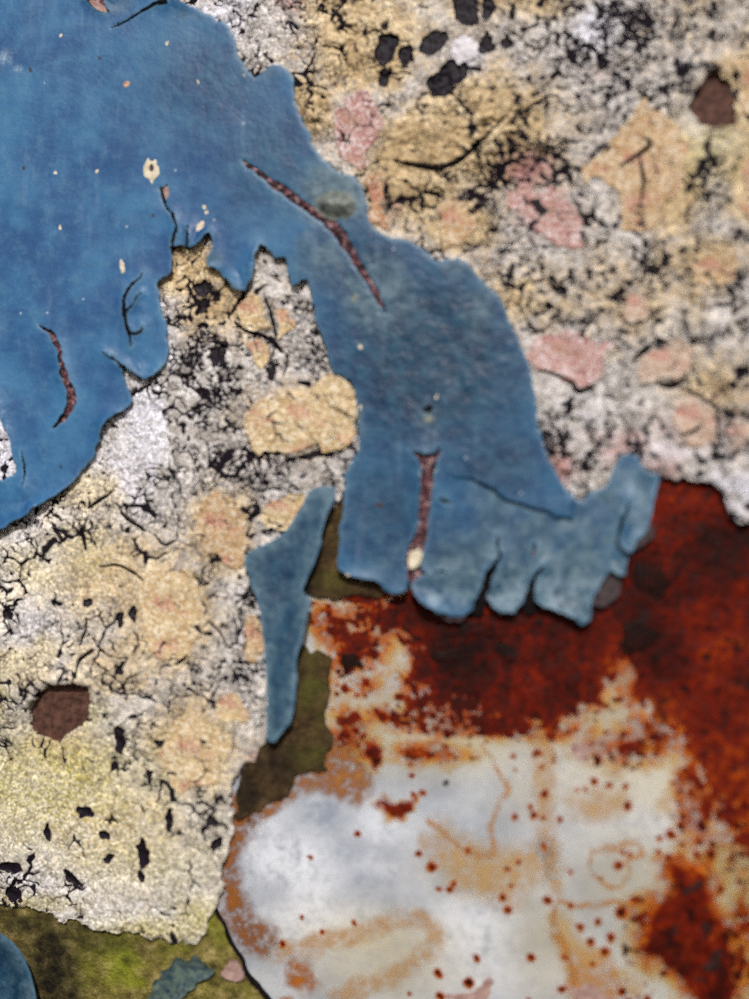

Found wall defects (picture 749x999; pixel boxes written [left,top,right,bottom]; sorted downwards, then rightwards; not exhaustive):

crack [393,115,507,171]
crack [243,161,386,313]
crack [229,292,283,353]
peeling [0,0,749,625]
crack [39,326,76,428]
crack [538,370,596,395]
crack [654,374,722,445]
crack [80,491,177,581]
crack [406,447,451,584]
peeling [0,232,359,946]
crack [75,618,94,675]
corrosion [222,476,749,999]